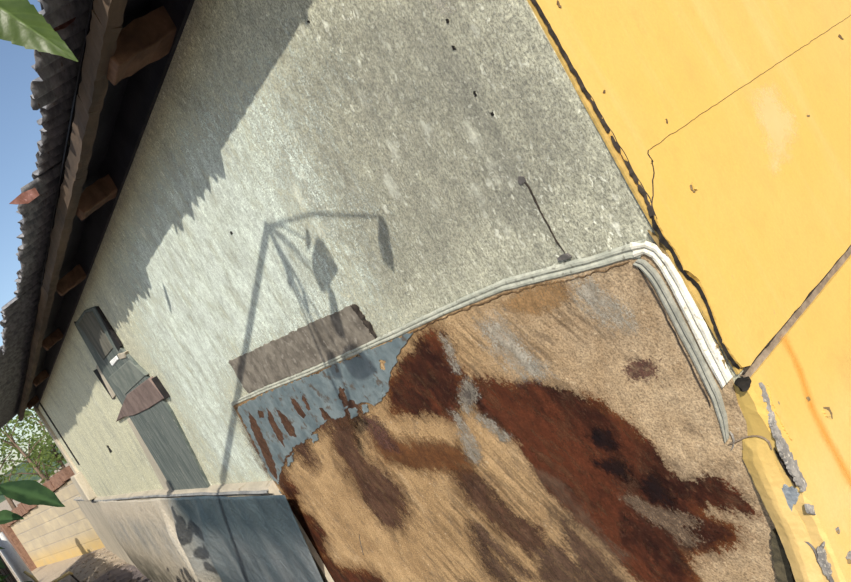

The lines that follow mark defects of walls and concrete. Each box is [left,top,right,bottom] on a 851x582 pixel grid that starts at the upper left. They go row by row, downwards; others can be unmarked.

crack [531,0,849,219]
water stain [480,320,547,379]
peeling [233,333,413,494]
water stain [328,414,412,531]
water stain [447,463,626,582]
water stain [619,493,706,550]
spalling [771,528,796,582]
spalling [758,382,816,515]